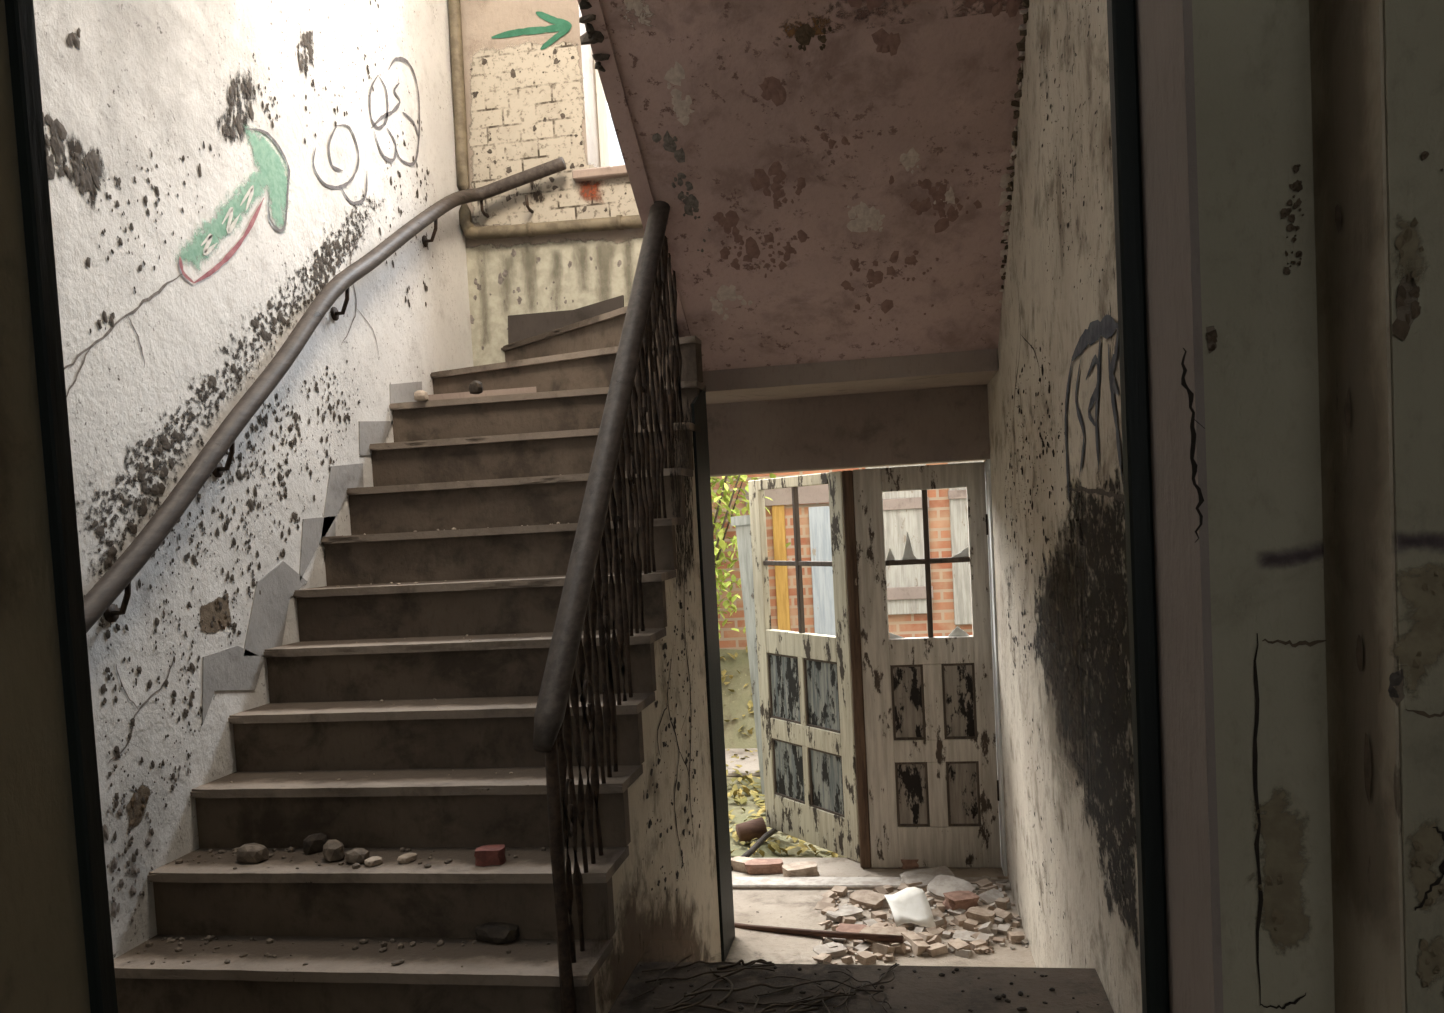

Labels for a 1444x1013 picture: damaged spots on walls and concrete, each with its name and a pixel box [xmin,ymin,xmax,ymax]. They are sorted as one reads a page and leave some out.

peeling [43,53,283,293]
peeling [294,23,386,144]
damp [749,161,806,209]
damp [777,0,912,56]
damp [946,0,1028,18]
peeling [76,120,433,581]
crack [1181,348,1205,543]
flaking render [99,360,360,923]
damp [1033,461,1139,949]
peeling [1250,789,1310,954]
crack [1253,633,1326,1009]
crack [1415,827,1444,911]